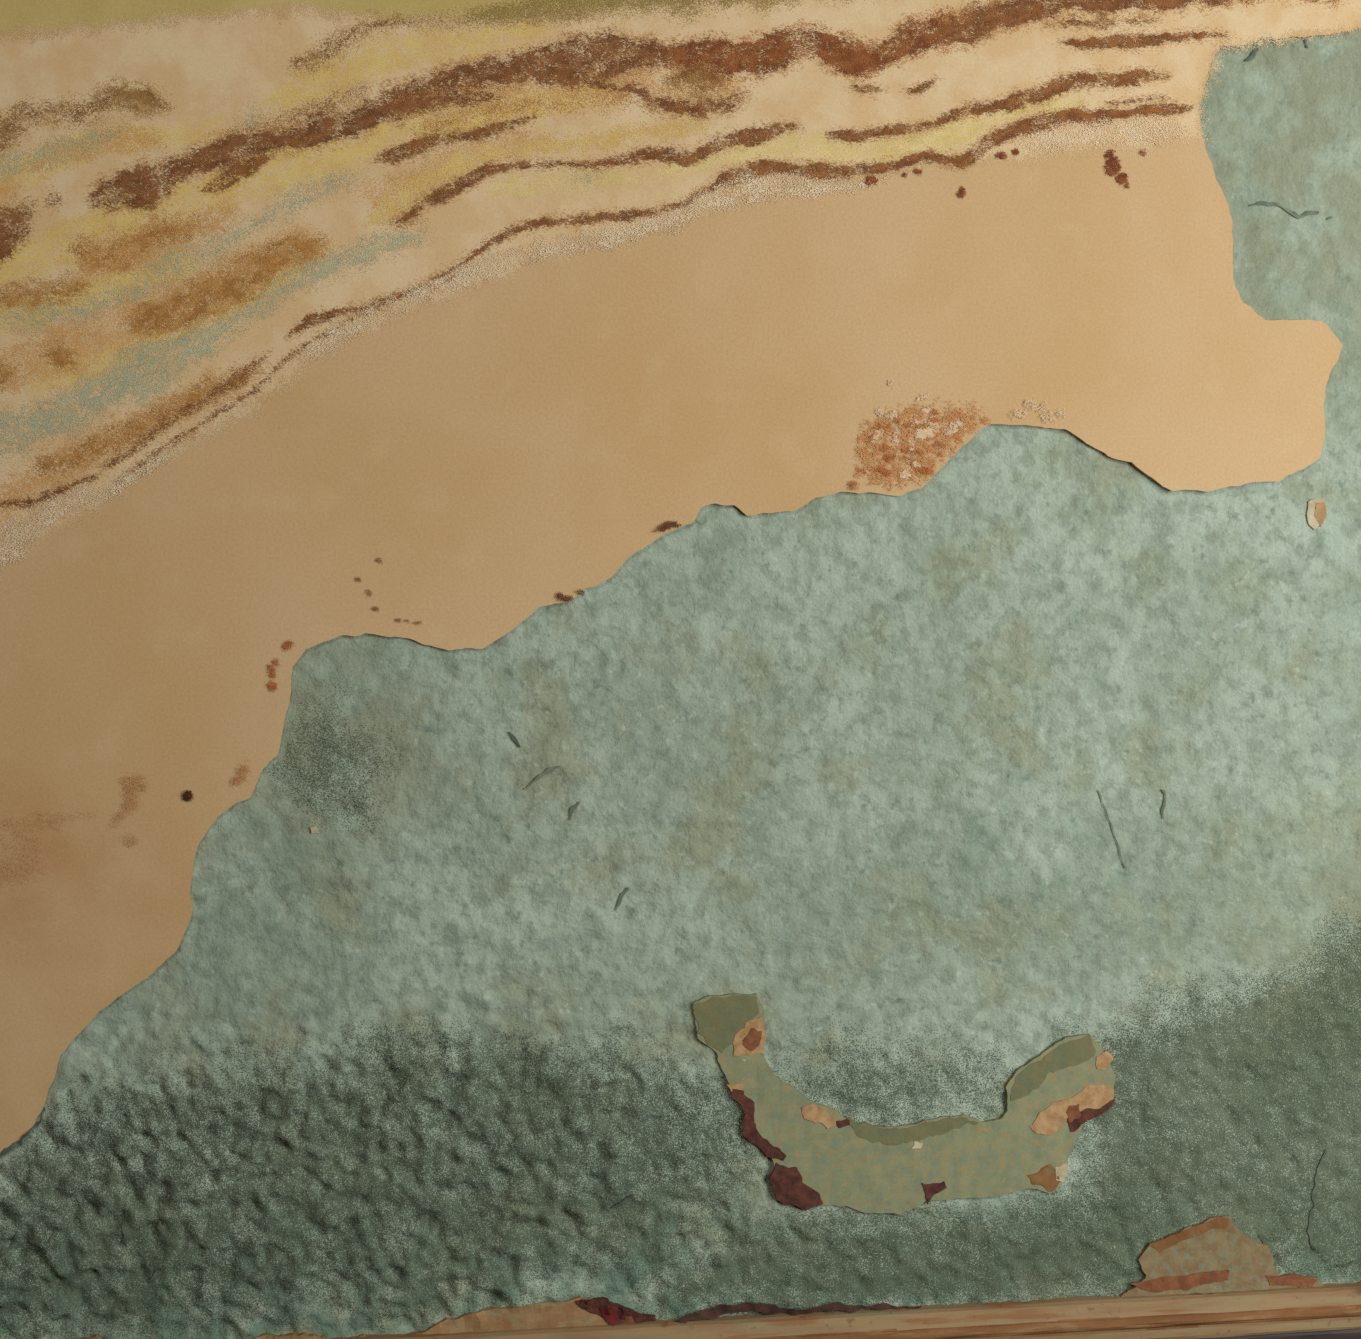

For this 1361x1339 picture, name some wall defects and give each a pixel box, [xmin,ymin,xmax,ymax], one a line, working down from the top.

damp [0,0,1361,571]
rust [846,393,991,491]
peeling [1306,498,1327,530]
damp [0,902,1361,1339]
peeling [692,993,1128,1214]
peeling [1119,1215,1323,1297]
spalling [1268,1229,1361,1284]
peeling [416,1296,610,1334]
spalling [576,1297,656,1326]